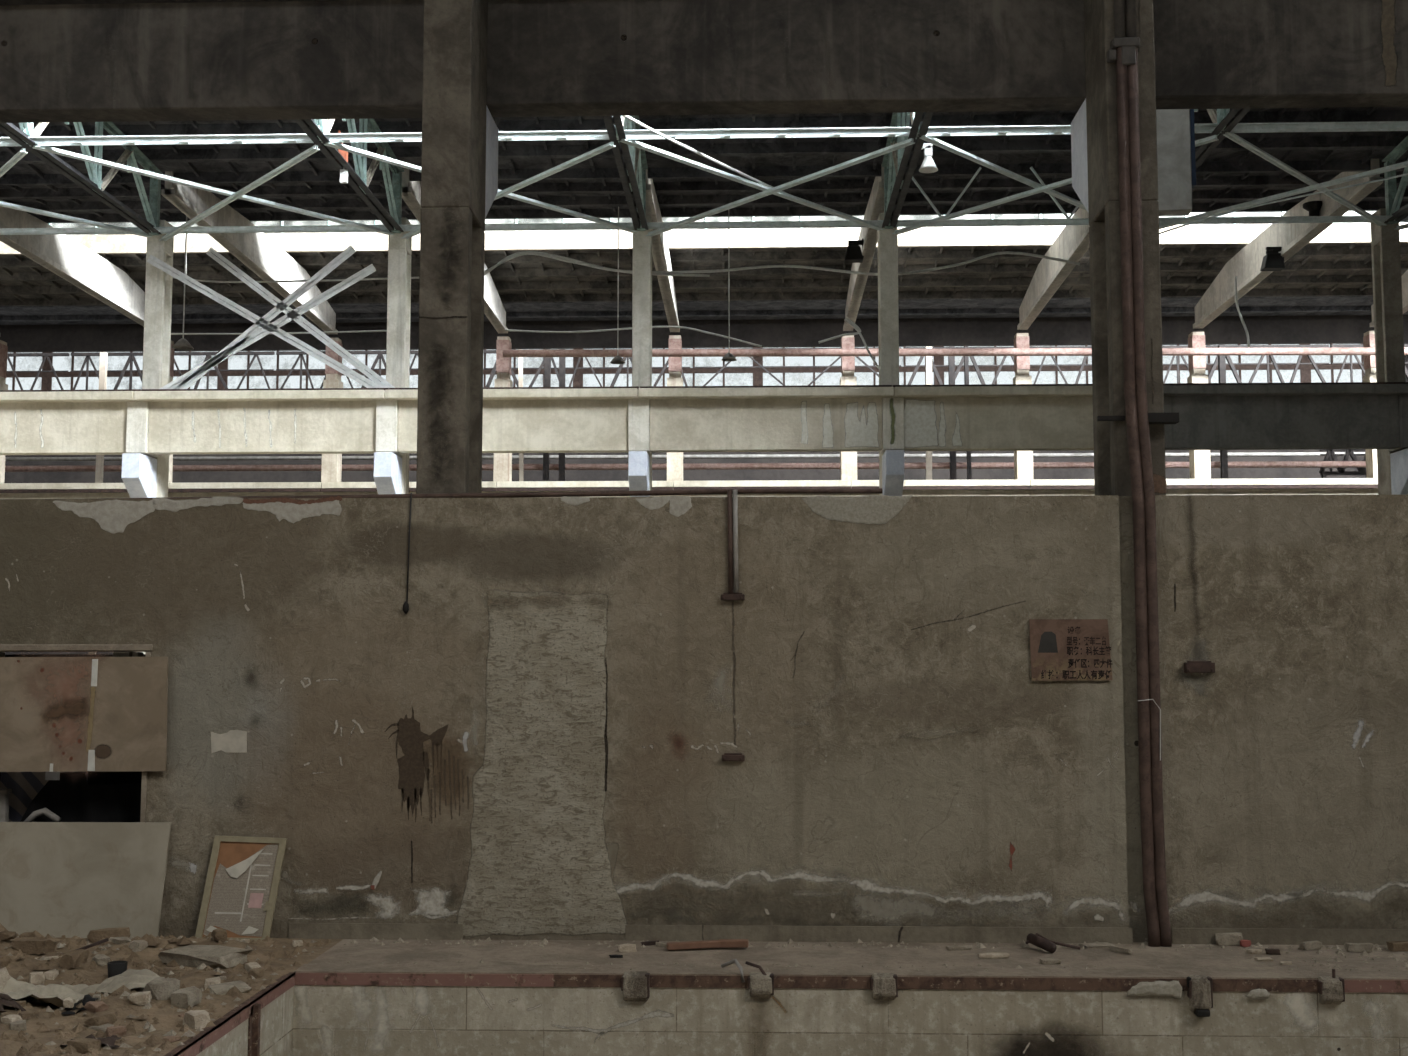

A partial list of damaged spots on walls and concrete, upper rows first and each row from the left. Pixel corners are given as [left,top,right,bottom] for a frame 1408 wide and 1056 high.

spalling [53,495,342,534]
damp [385,709,469,823]
efflorescence [615,870,1137,922]
efflorescence [1169,882,1408,915]